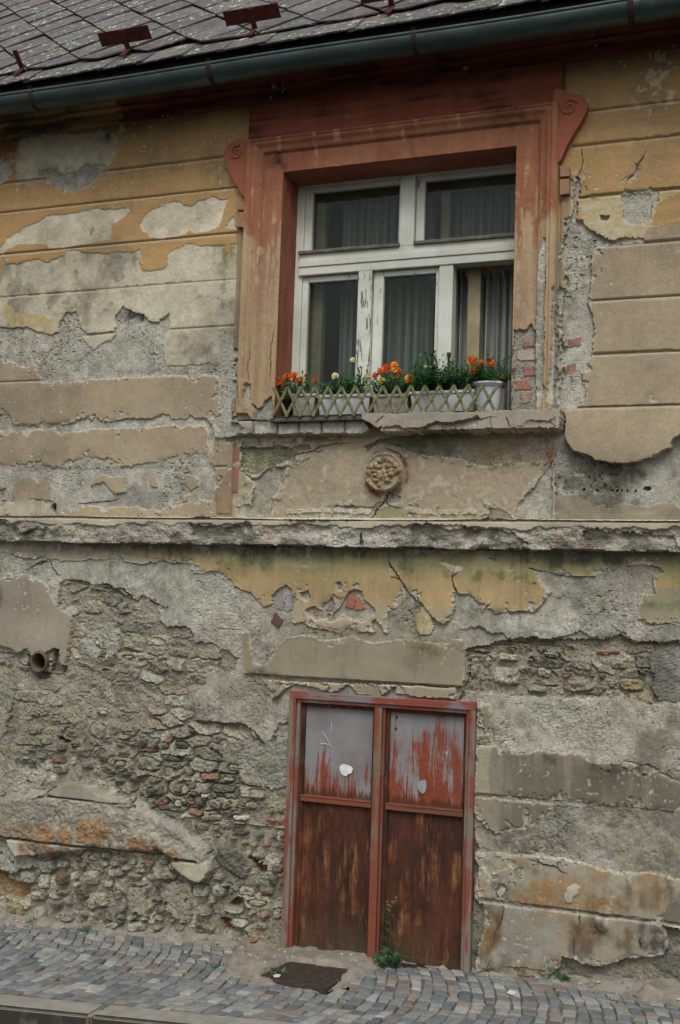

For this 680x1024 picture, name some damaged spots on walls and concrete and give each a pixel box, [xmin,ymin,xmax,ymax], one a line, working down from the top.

peeling [0,130,118,192]
peeling [0,196,273,511]
spalling [236,175,680,520]
crack [376,416,556,461]
crack [0,492,680,606]
peeling [400,546,463,573]
flaking render [0,551,680,943]
spalling [472,794,680,982]